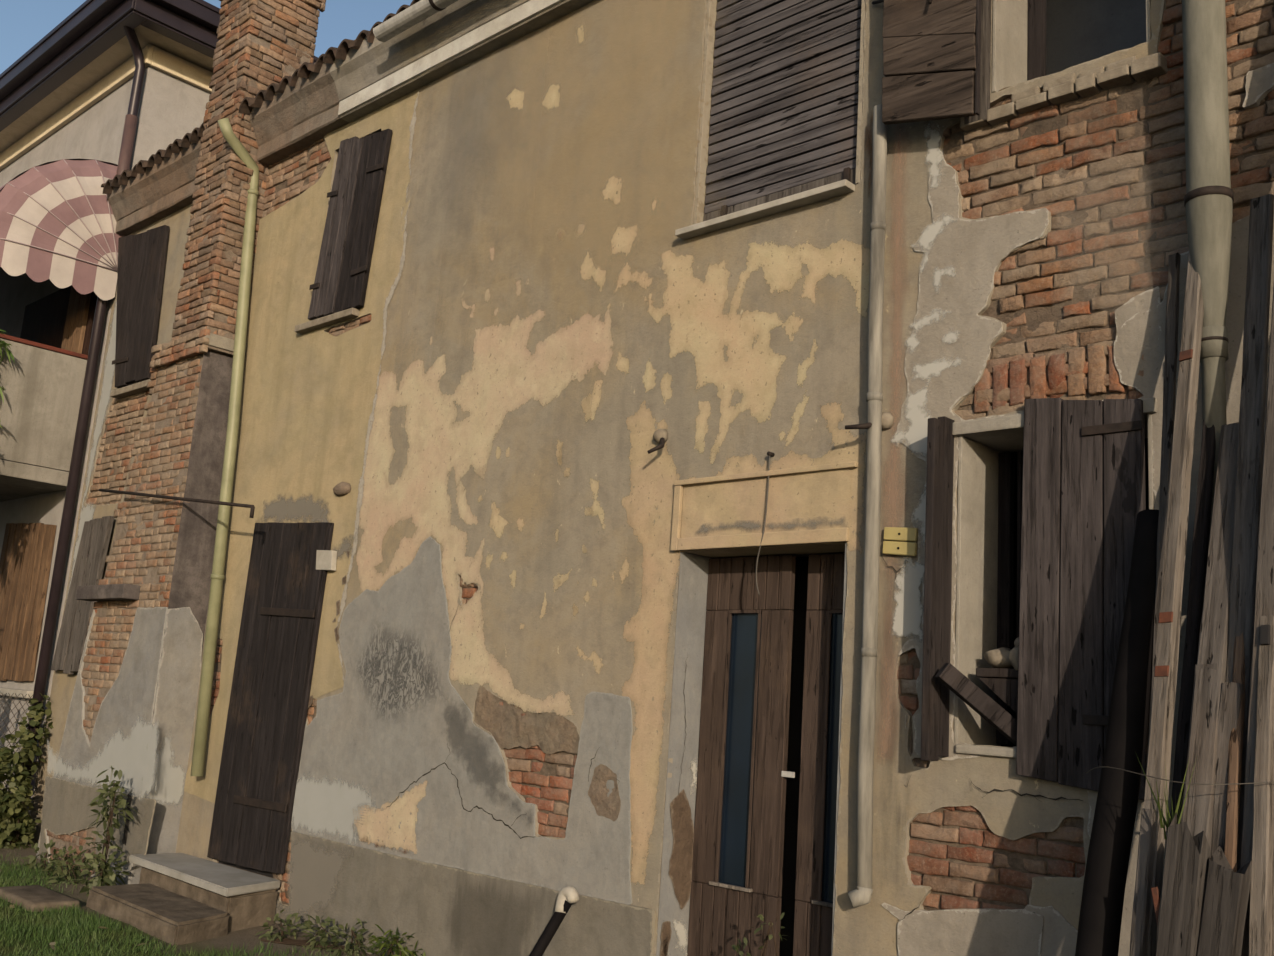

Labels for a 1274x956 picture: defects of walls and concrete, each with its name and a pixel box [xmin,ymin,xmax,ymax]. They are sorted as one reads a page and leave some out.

peeling [542,84,560,111]
flaking render [262,138,338,218]
flaking render [1225,0,1274,434]
flaking render [891,0,1189,768]
peeling [328,89,870,956]
damp [364,640,429,706]
peeling [1162,363,1203,881]
crack [386,743,531,839]
crack [971,781,1083,802]
flaking render [882,790,1098,956]
peeling [1118,799,1144,956]